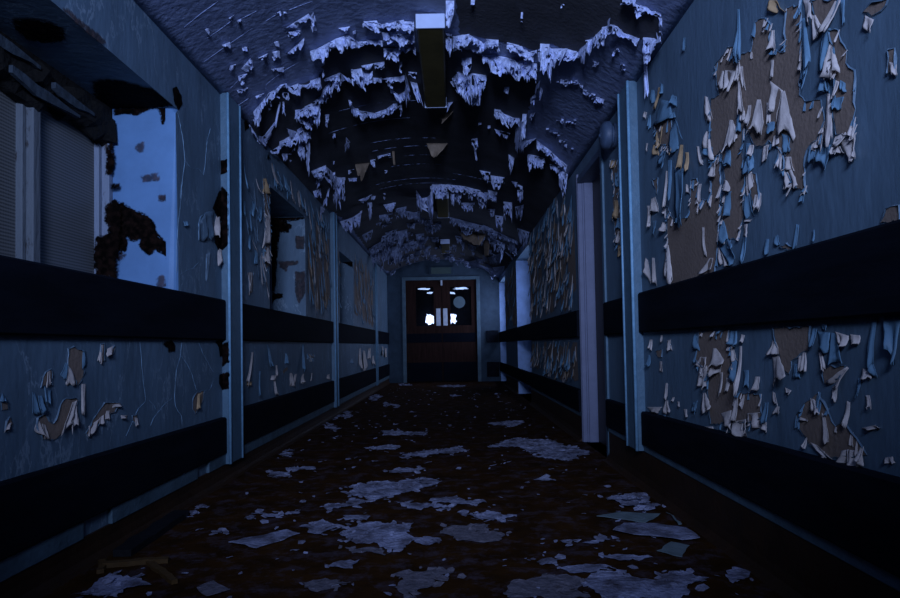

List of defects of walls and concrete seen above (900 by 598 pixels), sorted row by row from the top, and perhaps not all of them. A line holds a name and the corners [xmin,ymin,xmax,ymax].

peeling [862,0,889,33]
peeling [886,47,897,75]
peeling [243,0,857,327]
flaking render [213,187,229,250]
peeling [879,204,900,224]
peeling [32,343,139,441]
flaking render [216,340,230,390]
peeling [246,344,315,396]
peeling [530,341,579,382]
peeling [645,316,900,467]